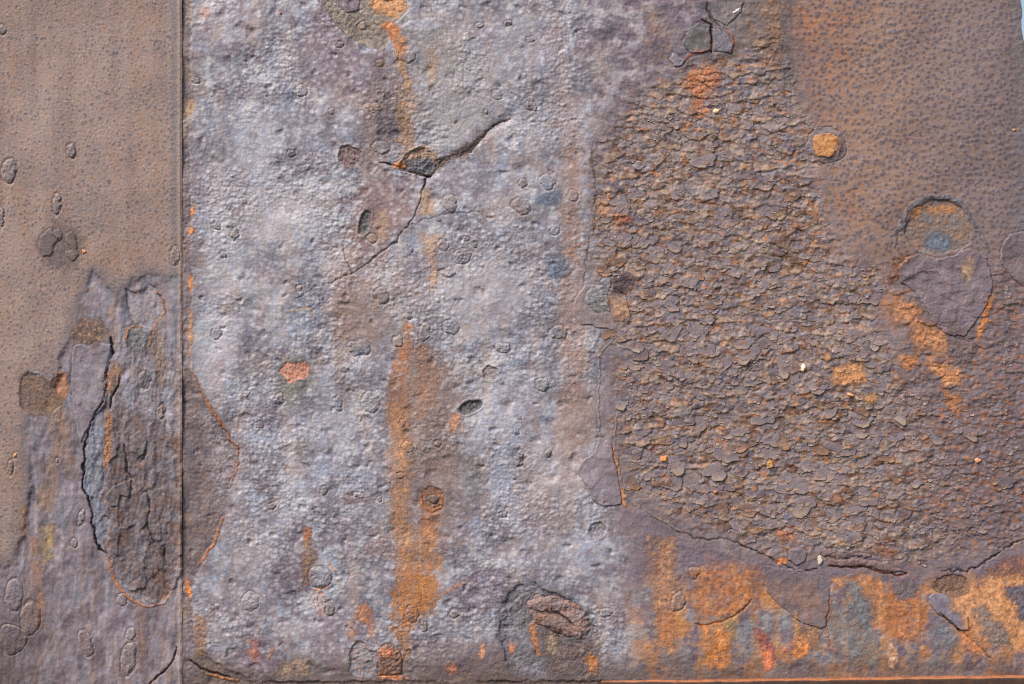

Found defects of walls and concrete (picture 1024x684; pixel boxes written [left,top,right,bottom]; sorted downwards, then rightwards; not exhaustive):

rust [324,0,416,155]
crack [341,120,508,278]
spalling [894,194,989,255]
rust [275,361,309,405]
rust [566,0,1024,673]
crack [81,337,170,607]
spalling [86,422,174,590]
rust [349,313,470,680]
spalling [497,581,596,680]
crack [695,599,752,627]
crack [946,539,1024,573]